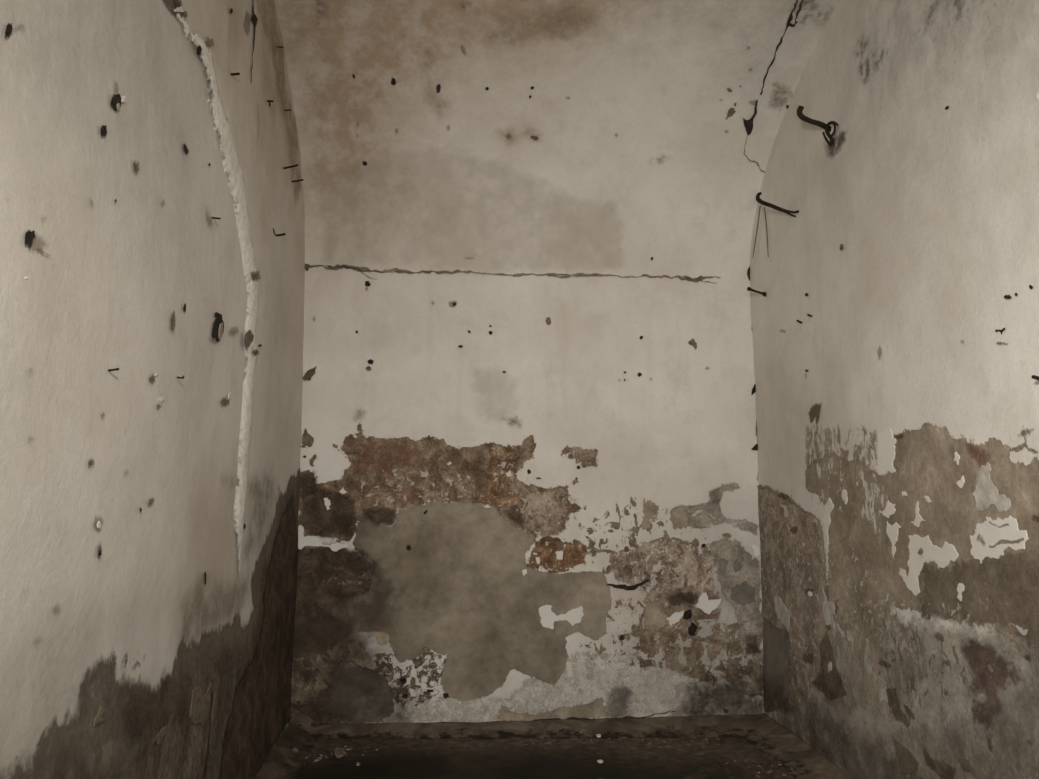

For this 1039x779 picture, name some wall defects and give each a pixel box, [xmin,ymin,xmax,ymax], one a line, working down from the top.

crack [743,0,803,173]
crack [305,264,720,284]
leakage [0,469,390,779]
peeling [290,403,1039,779]
leakage [395,652,1039,779]